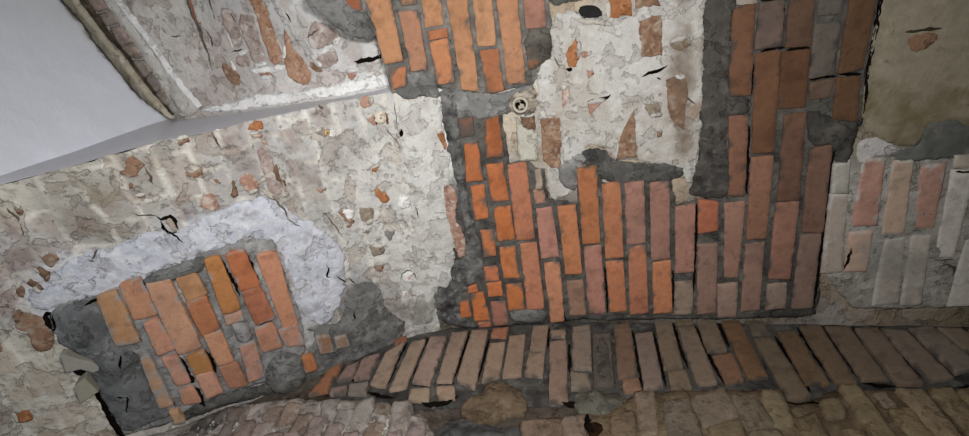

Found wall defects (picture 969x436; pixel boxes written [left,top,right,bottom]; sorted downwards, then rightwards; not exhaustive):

crack [132,213,182,242]
peeling [13,120,346,352]
peeling [200,0,466,325]
peeling [515,0,706,201]
peeling [856,137,905,163]